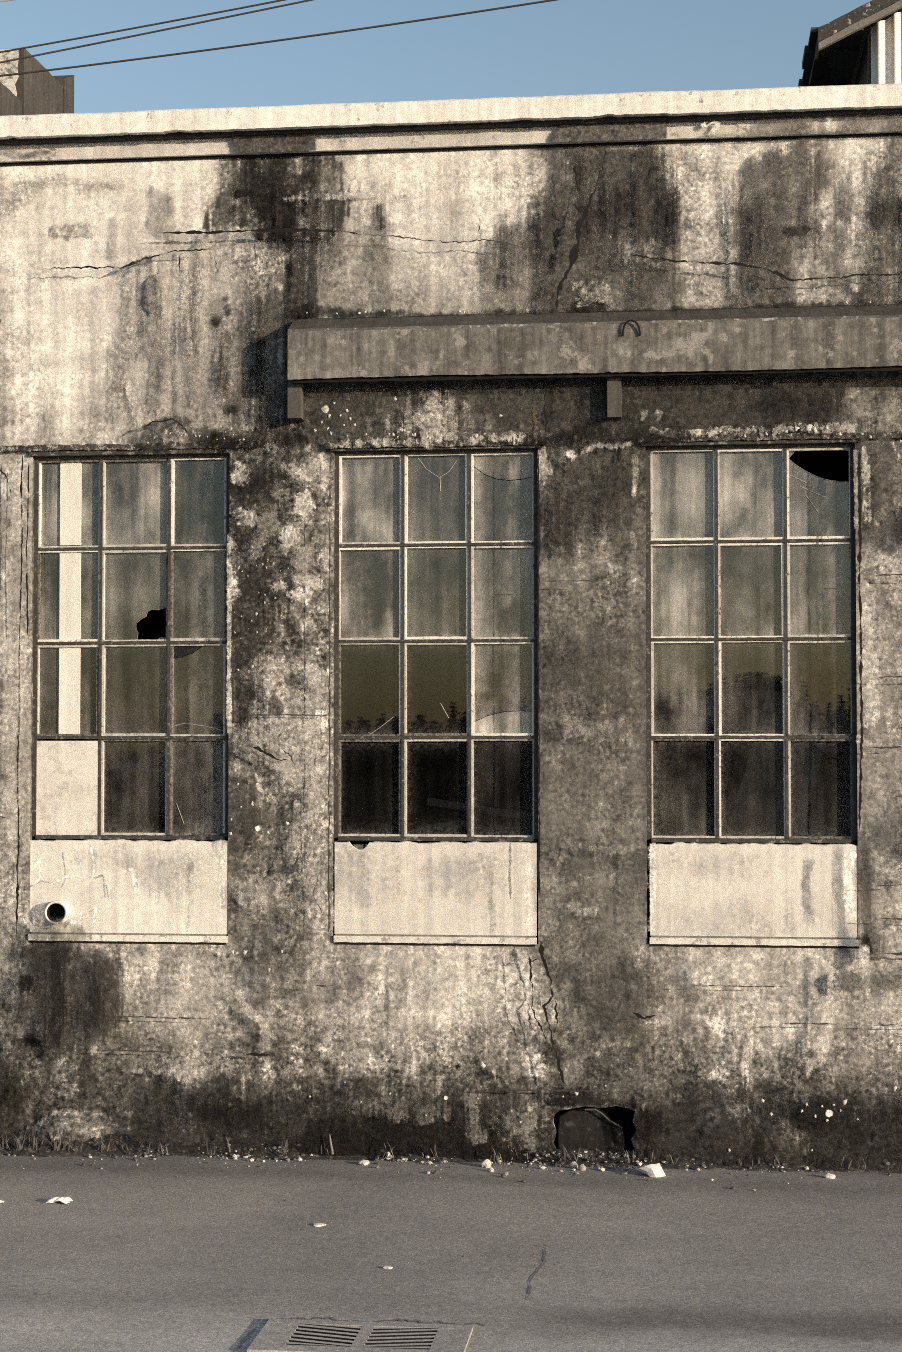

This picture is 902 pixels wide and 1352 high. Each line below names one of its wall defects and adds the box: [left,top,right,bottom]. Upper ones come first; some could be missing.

leakage [51,219,114,258]
crack [38,220,518,272]
crack [631,254,902,284]
leakage [108,113,902,852]
leakage [0,942,124,1139]
leakage [235,912,306,1038]
peeling [353,1098,451,1125]
peeling [465,1090,487,1145]
leakage [112,979,902,1170]
crack [492,941,629,1093]
spalling [505,1098,643,1152]
leakage [806,842,902,1074]